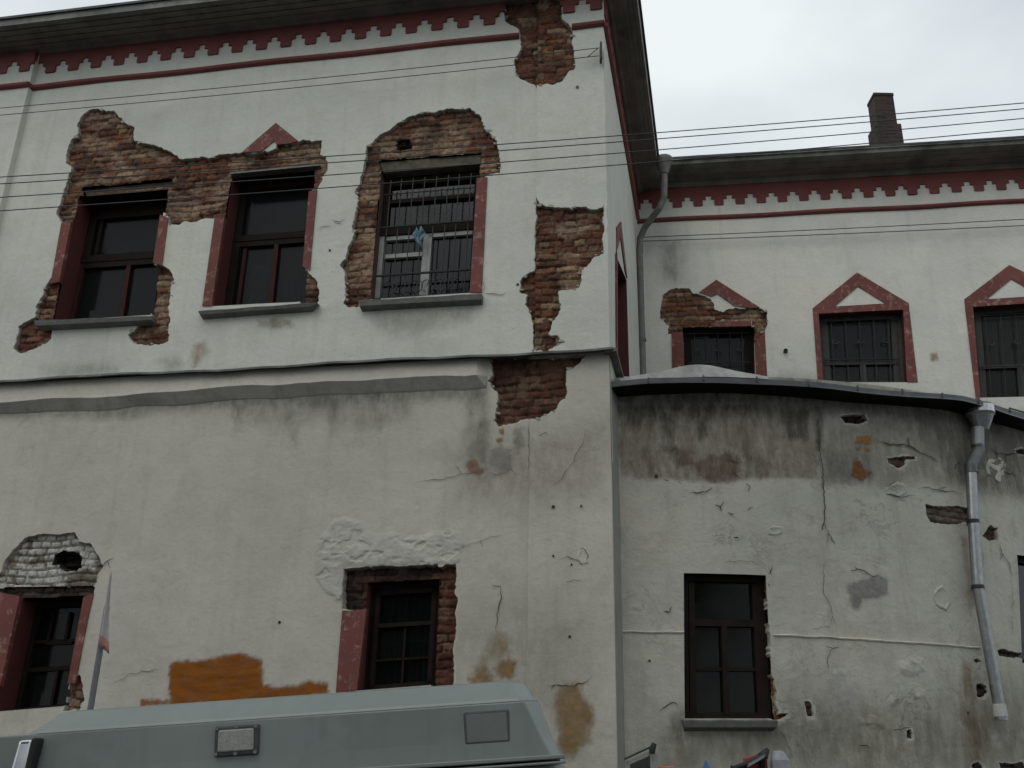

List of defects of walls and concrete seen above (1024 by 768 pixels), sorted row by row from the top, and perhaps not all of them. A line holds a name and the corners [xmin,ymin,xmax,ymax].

spalling [504,0,576,87]
spalling [56,108,328,227]
spalling [340,108,501,308]
spalling [13,279,60,353]
spalling [128,264,175,346]
spalling [299,270,319,303]
spalling [488,197,608,442]
spalling [659,288,768,344]
crack [818,414,835,543]
spalling [925,504,967,525]
spalling [0,532,103,598]
spalling [341,564,458,686]